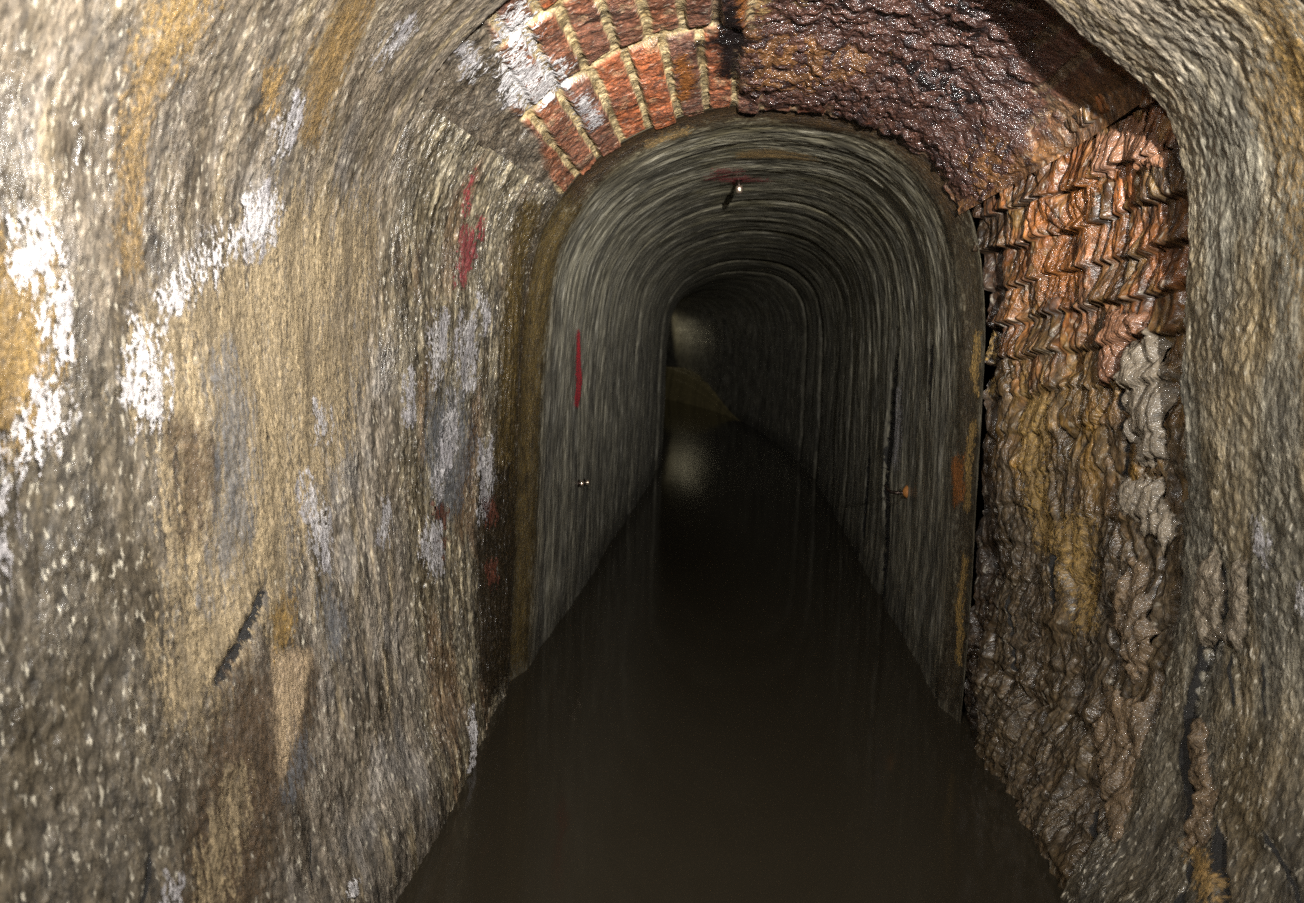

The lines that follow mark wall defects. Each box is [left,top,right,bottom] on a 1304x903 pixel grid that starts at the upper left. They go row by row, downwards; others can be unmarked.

rust [734,0,770,23]
rust [672,53,701,101]
water stain [401,0,1056,716]
water stain [375,499,394,550]
crack [1173,567,1266,903]
crack [1262,830,1303,903]